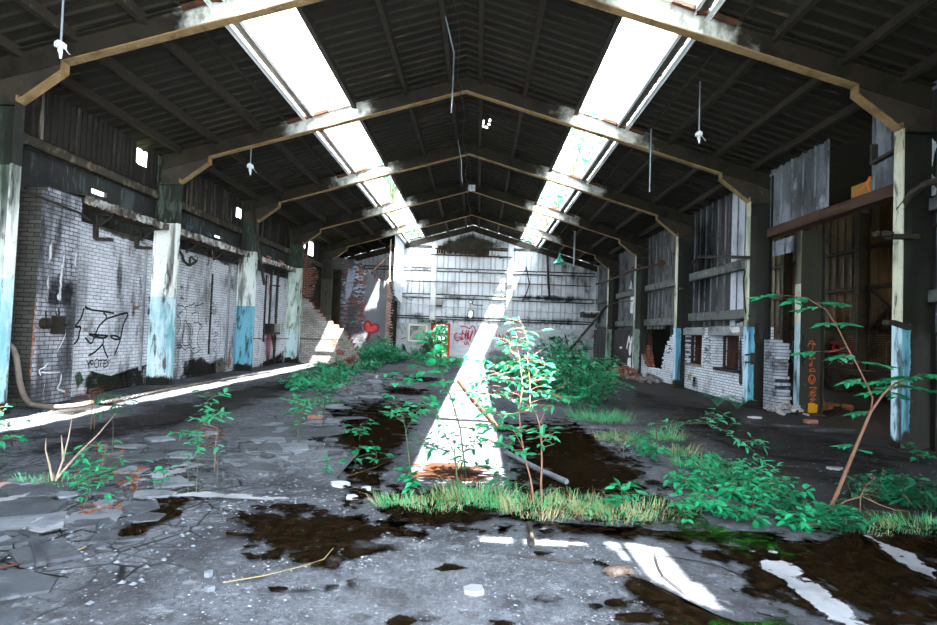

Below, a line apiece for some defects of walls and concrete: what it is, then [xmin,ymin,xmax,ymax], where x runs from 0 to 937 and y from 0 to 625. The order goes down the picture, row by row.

water stain [75,364,147,395]
crack [45,504,86,542]
crack [0,556,69,578]